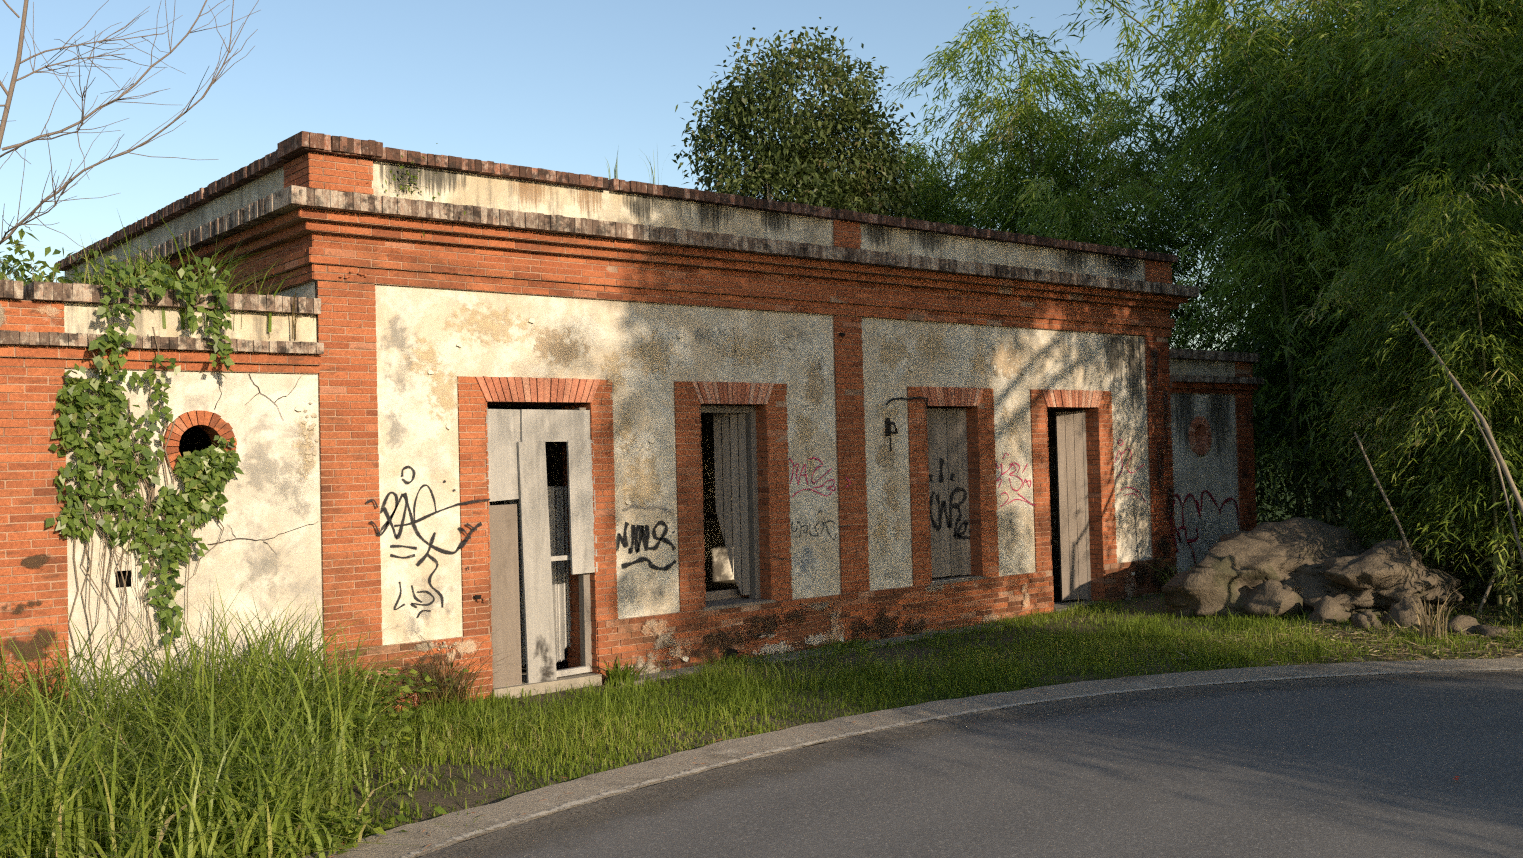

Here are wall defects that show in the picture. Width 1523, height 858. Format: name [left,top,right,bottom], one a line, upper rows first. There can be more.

damp [380,163,466,194]
damp [627,196,653,216]
damp [690,204,728,229]
damp [1060,250,1138,278]
crack [215,373,300,419]
crack [208,522,317,550]
flaking render [802,601,844,643]
flaking render [631,620,690,675]